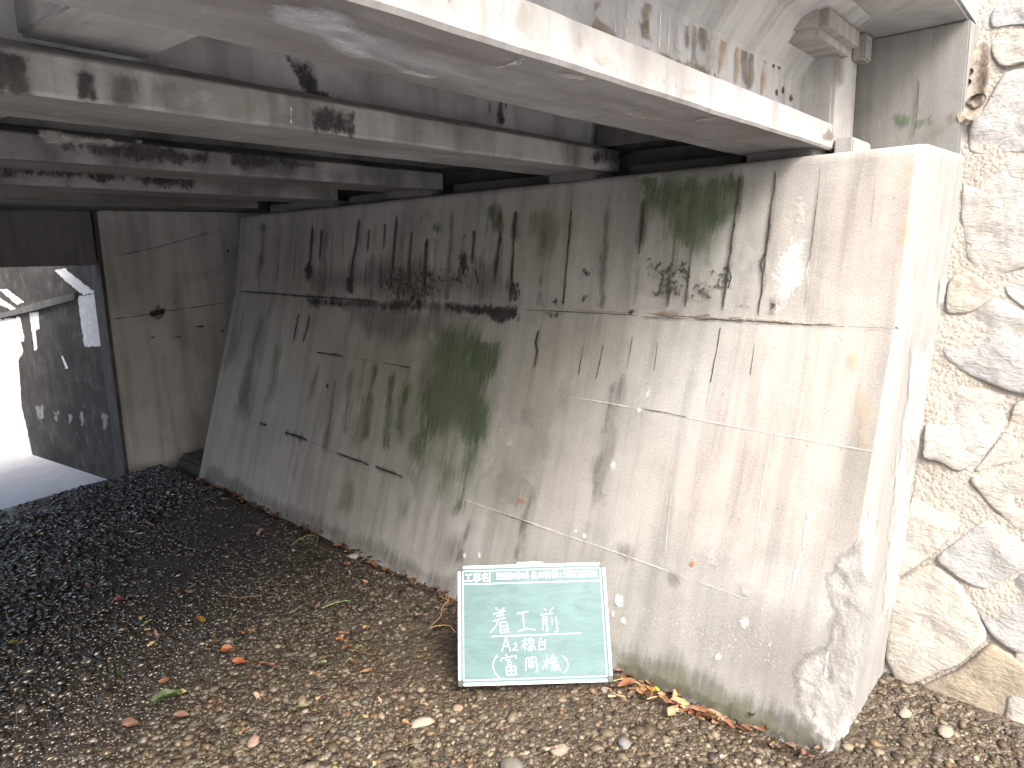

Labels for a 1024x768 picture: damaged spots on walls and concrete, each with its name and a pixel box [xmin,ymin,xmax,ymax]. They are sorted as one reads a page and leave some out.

damp [0,54,29,94]
damp [77,73,96,101]
damp [287,57,355,138]
damp [1,168,196,190]
damp [41,132,208,166]
damp [231,151,337,170]
damp [311,207,517,323]
damp [647,258,726,316]
crack [510,173,899,383]
crack [116,291,377,356]
spalling [794,512,877,752]